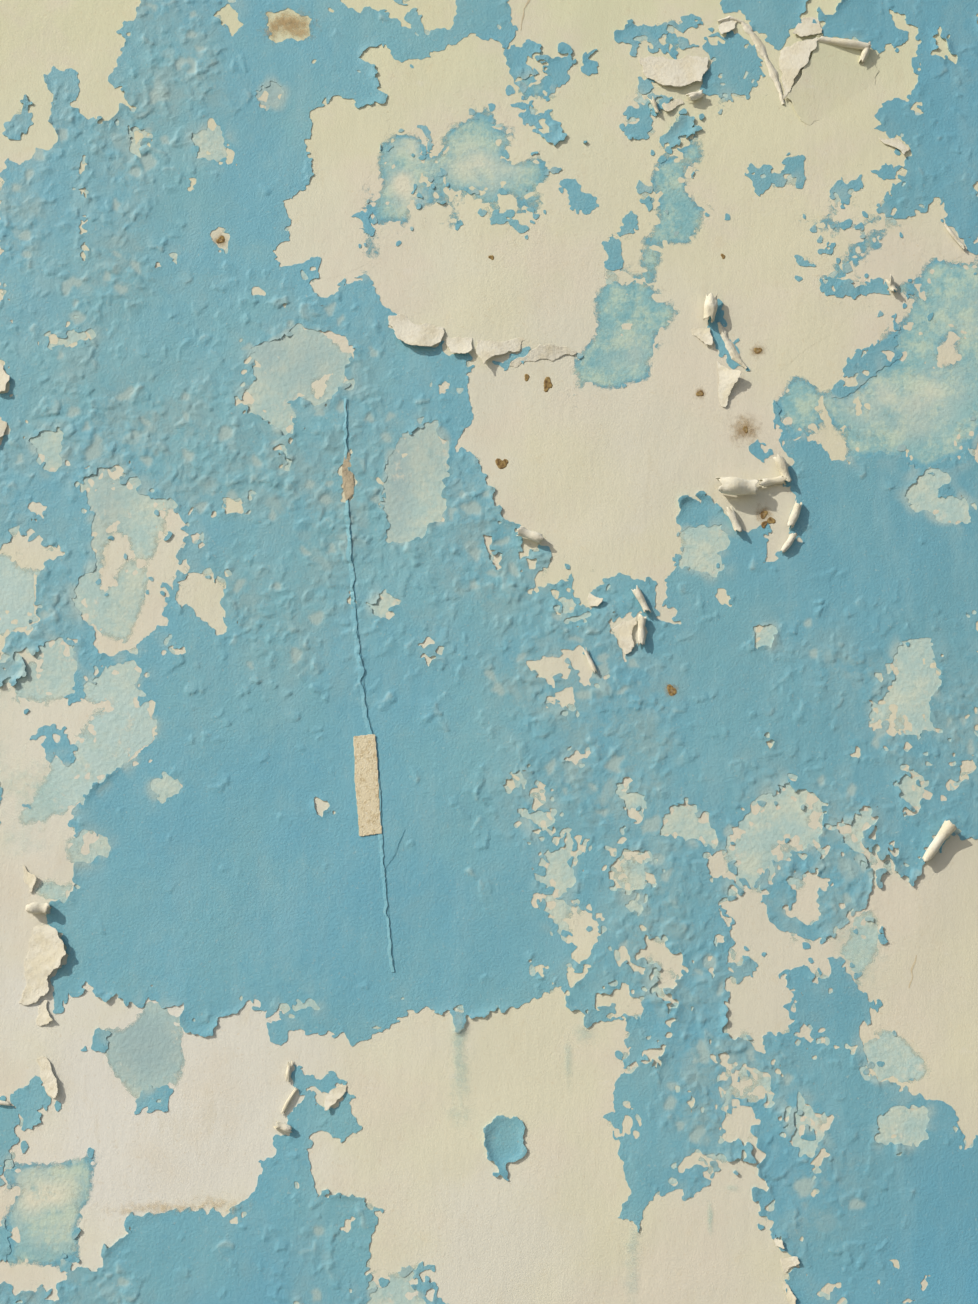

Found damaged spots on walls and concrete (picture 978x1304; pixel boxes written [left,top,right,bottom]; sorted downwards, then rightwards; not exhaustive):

damp [268,14,305,36]
crack [342,398,405,972]
peeling [30,716,96,766]
peeling [23,865,37,893]